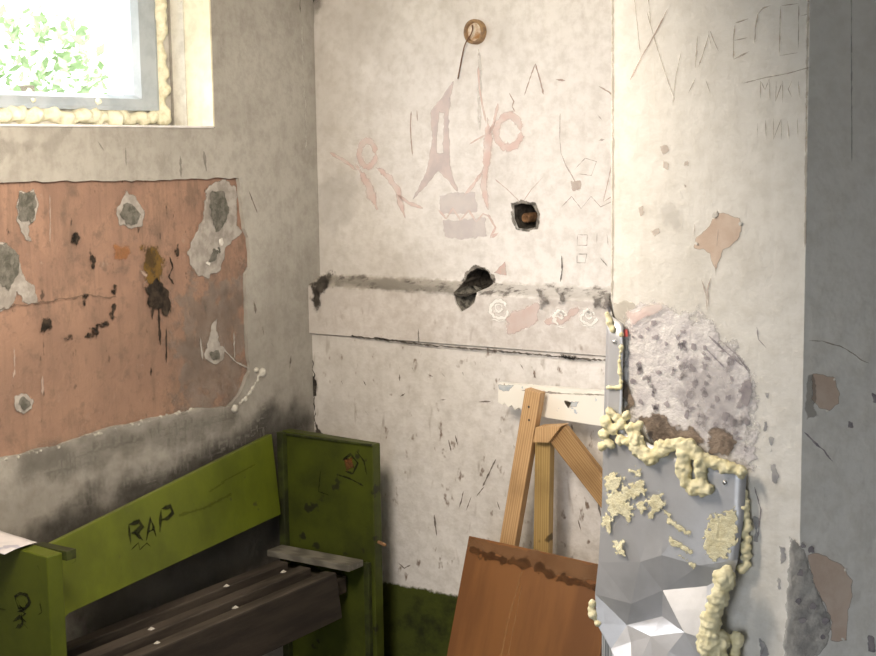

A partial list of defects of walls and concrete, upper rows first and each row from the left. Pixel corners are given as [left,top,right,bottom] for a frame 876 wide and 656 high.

spalling [511,200,540,232]
spalling [454,262,506,312]
flaking render [0,178,266,461]
crack [351,331,605,361]
flaking render [610,211,774,470]
flaking render [812,374,840,412]
peeling [752,487,761,542]
flaking render [777,539,853,656]